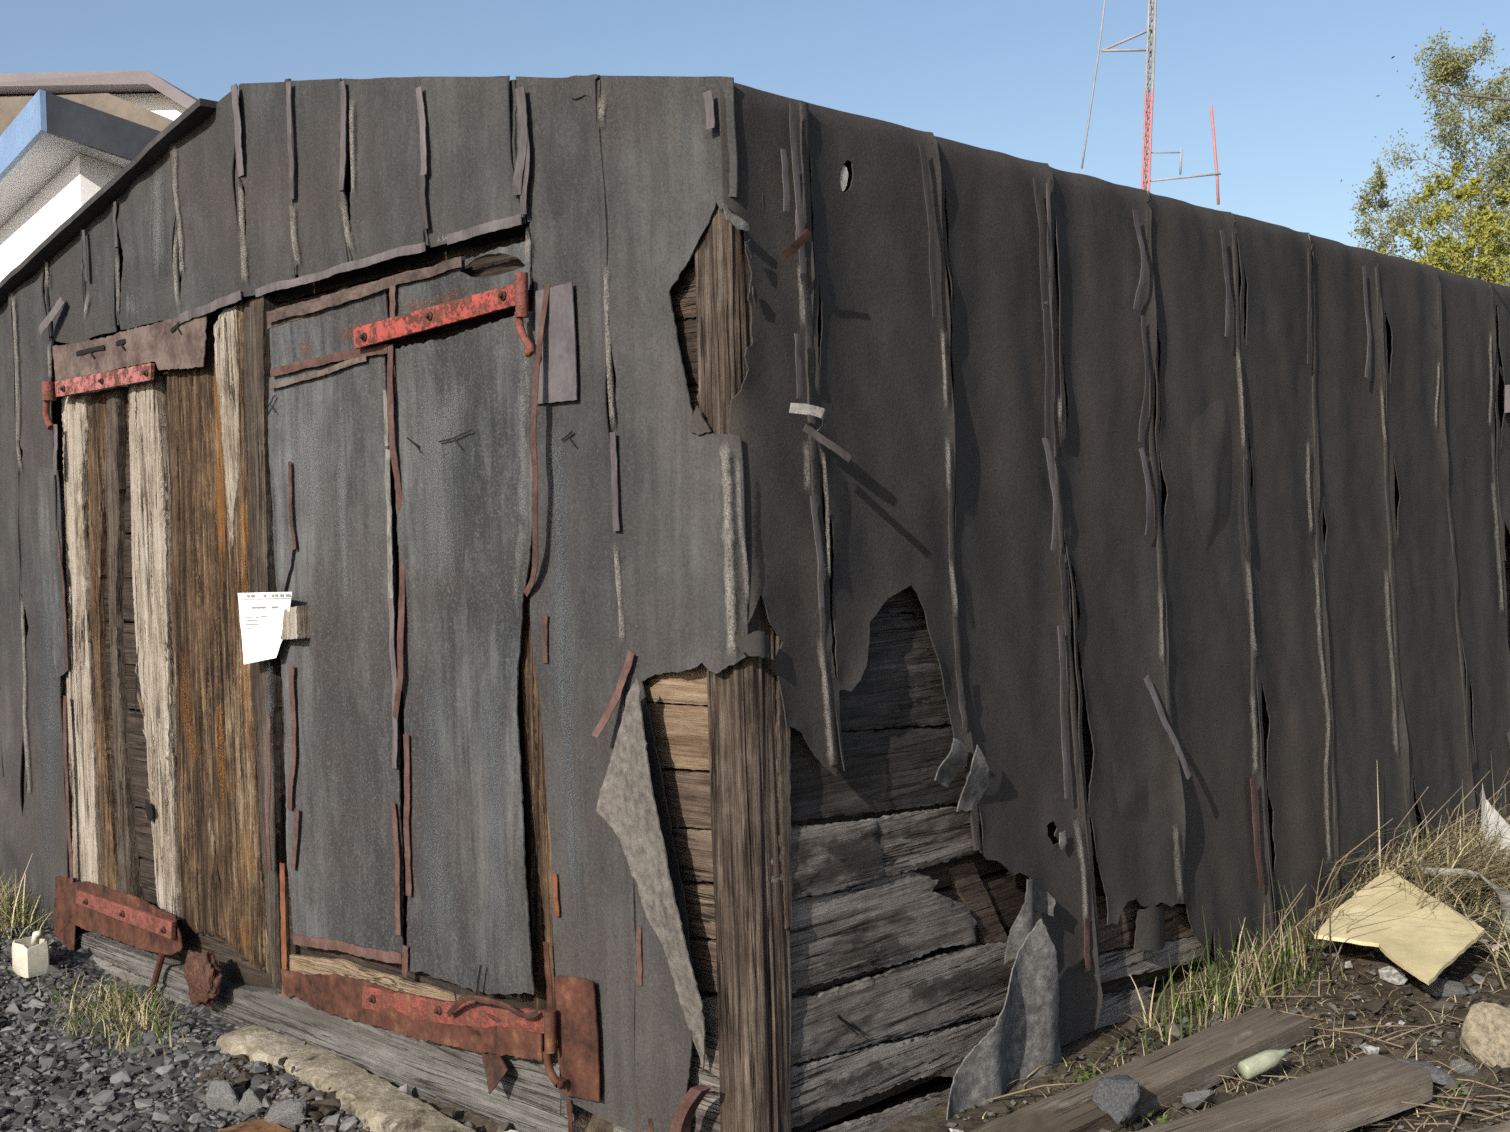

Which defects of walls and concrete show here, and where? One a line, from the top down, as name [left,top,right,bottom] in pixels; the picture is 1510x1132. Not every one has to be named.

peeling [722,203,753,258]
peeling [734,631,769,658]
peeling [935,738,989,812]
peeling [596,678,706,1070]
peeling [1059,830,1067,851]
peeling [946,879,1062,1120]